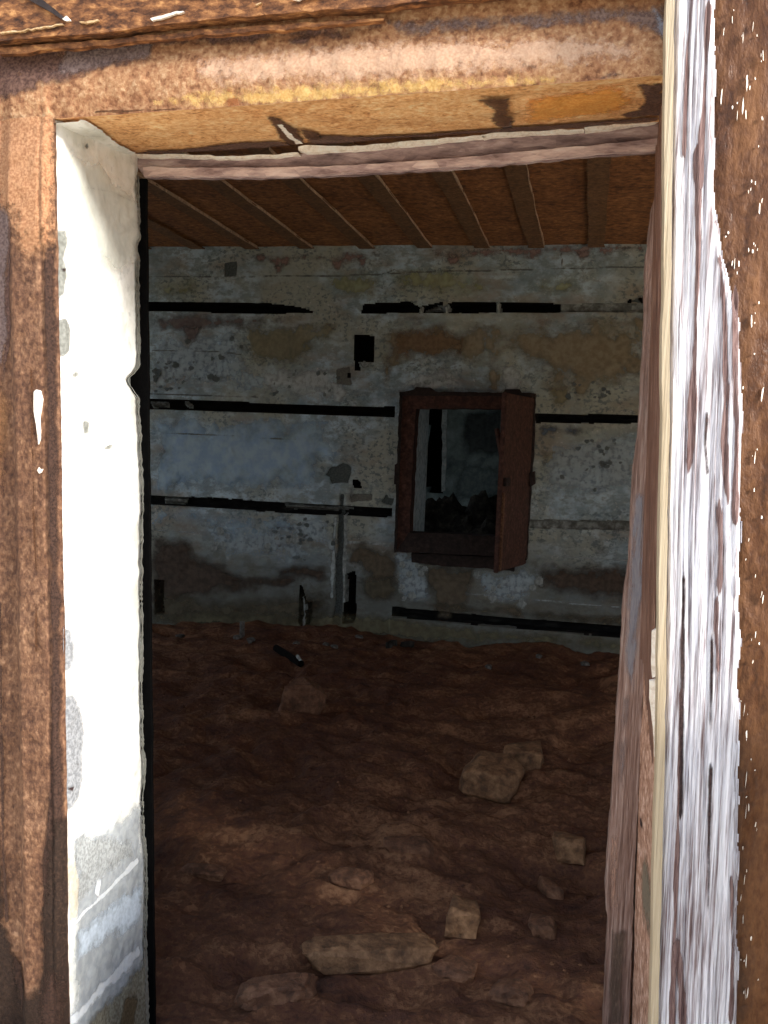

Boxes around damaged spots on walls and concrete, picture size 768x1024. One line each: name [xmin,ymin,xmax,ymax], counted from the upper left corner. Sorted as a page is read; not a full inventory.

leakage [160,316,332,362]
spalling [76,178,150,1024]
leakage [152,539,626,649]